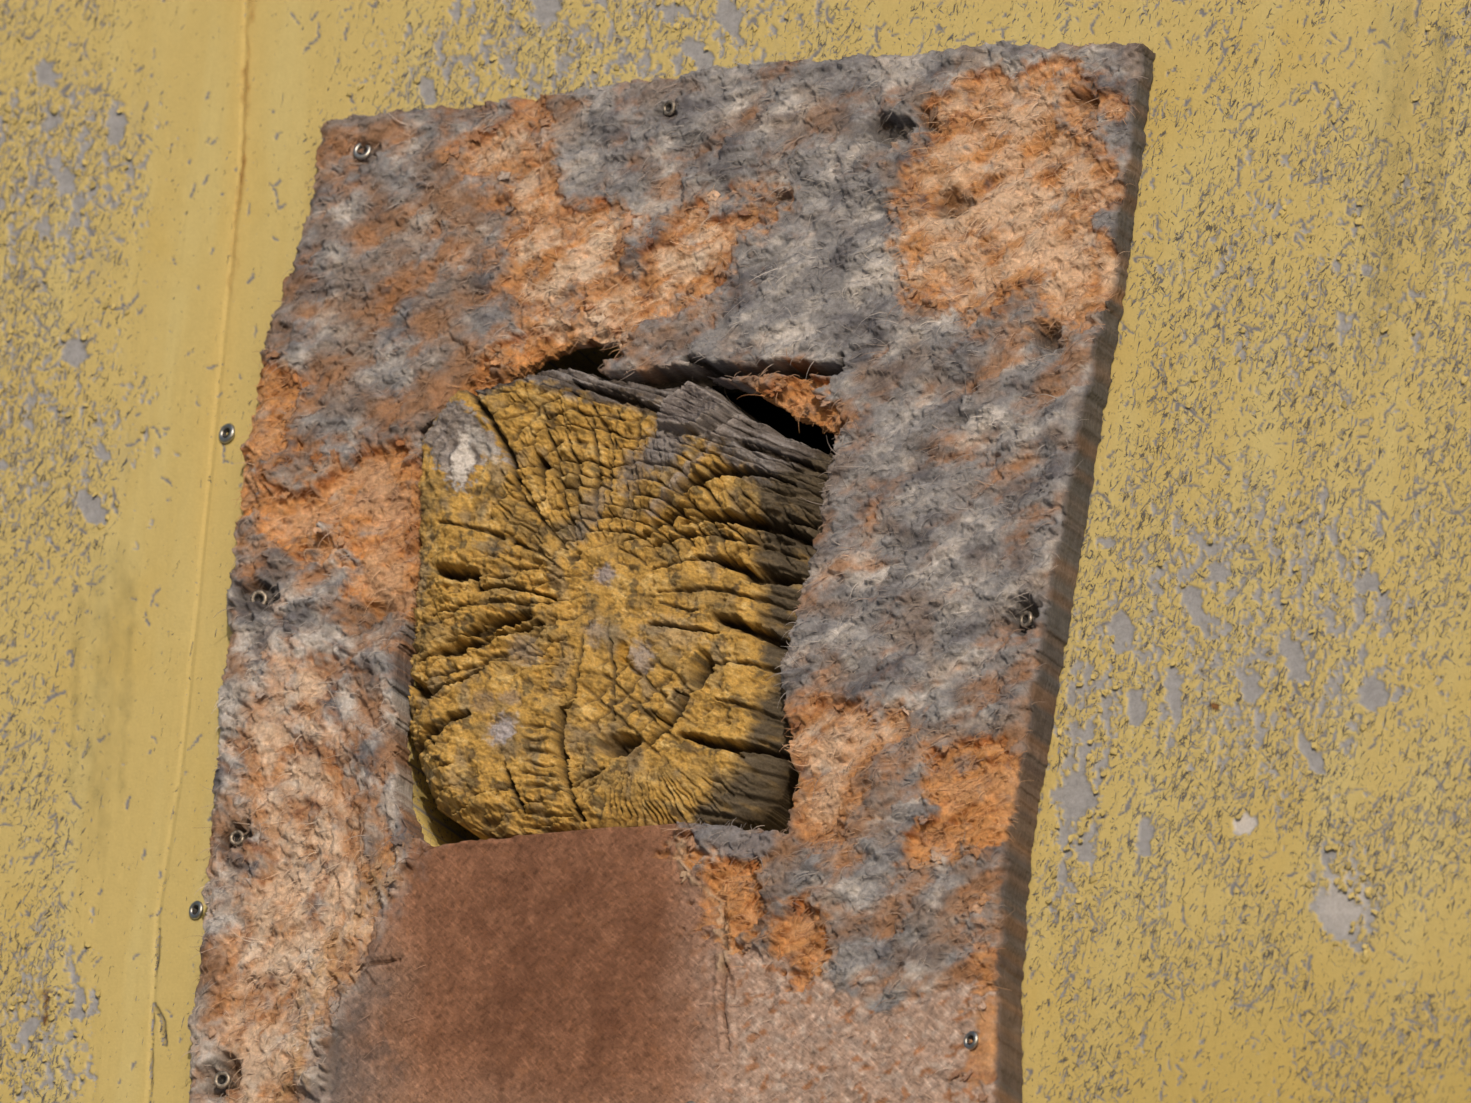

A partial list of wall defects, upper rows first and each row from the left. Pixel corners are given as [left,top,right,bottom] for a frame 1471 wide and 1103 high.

peeling [1290,81,1356,141]
peeling [0,39,149,569]
crack [467,392,552,495]
crack [571,351,845,413]
crack [619,440,828,587]
peeling [1044,138,1471,923]
crack [411,565,557,753]
crack [554,700,605,822]
crack [645,615,790,650]
crack [646,689,792,762]
peeling [1291,790,1394,964]
peeling [0,895,101,1103]